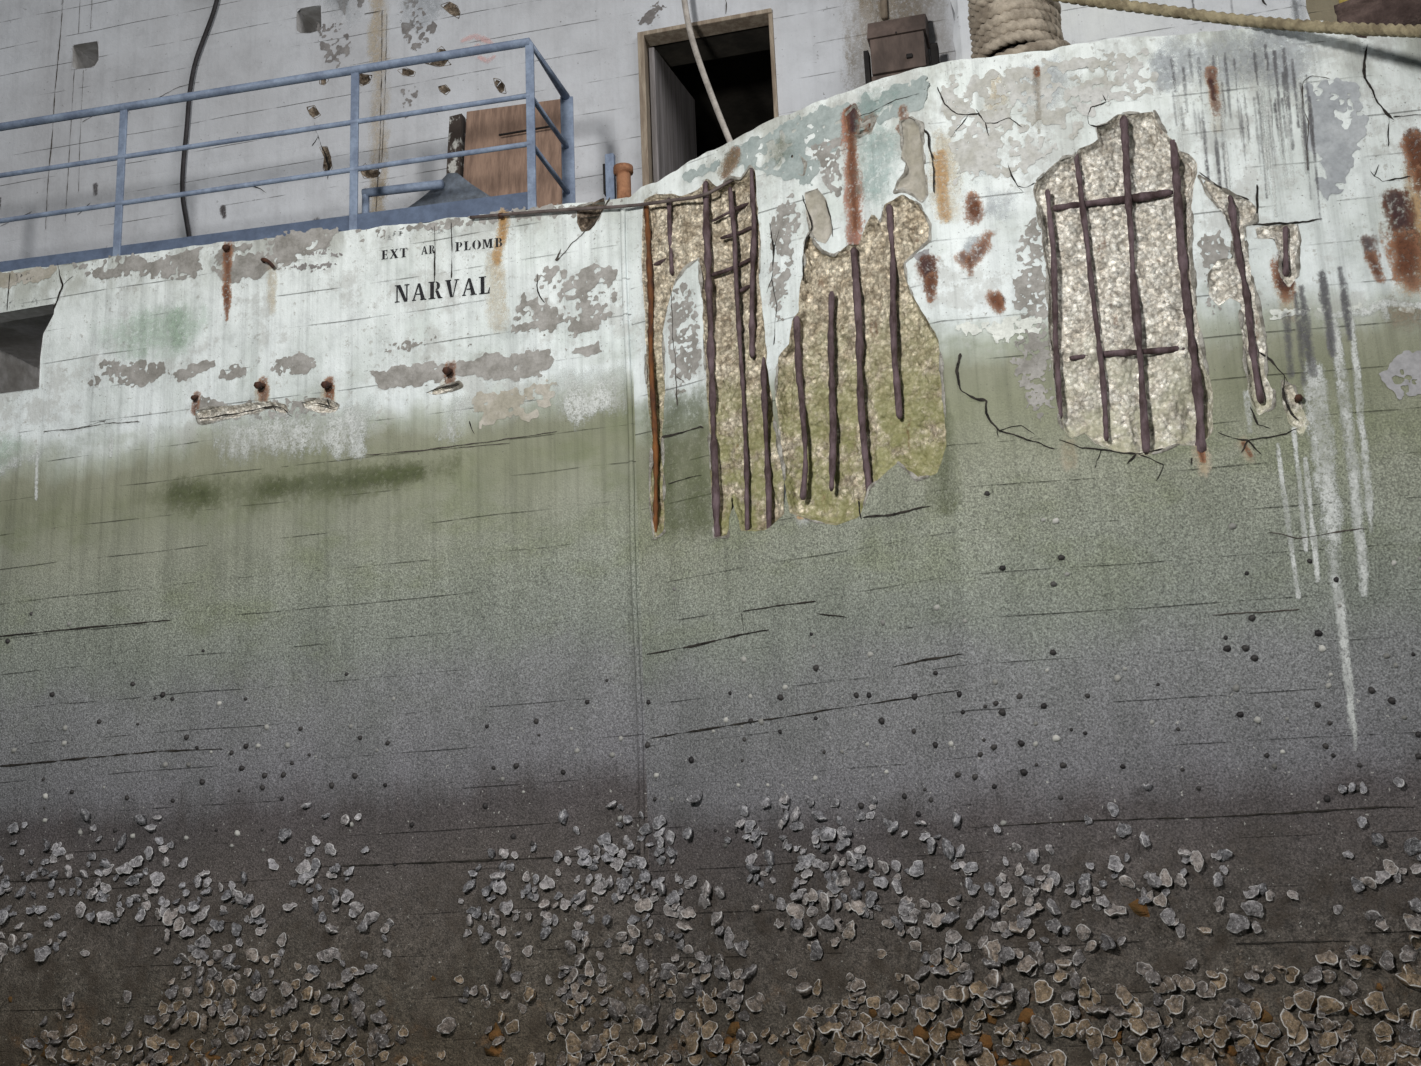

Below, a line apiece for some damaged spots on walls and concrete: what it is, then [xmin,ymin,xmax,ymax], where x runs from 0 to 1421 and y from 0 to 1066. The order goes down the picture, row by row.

leakage [0,435,42,501]
rust [222,242,233,320]
peeling [0,198,623,289]
peeling [370,263,618,429]
rust [840,103,876,245]
spalling [641,48,1326,540]
crack [955,353,1192,481]
crack [1218,352,1298,455]
peeling [1304,78,1369,201]
leakage [1277,266,1421,736]
crack [1301,47,1418,182]
rust [1361,128,1421,294]